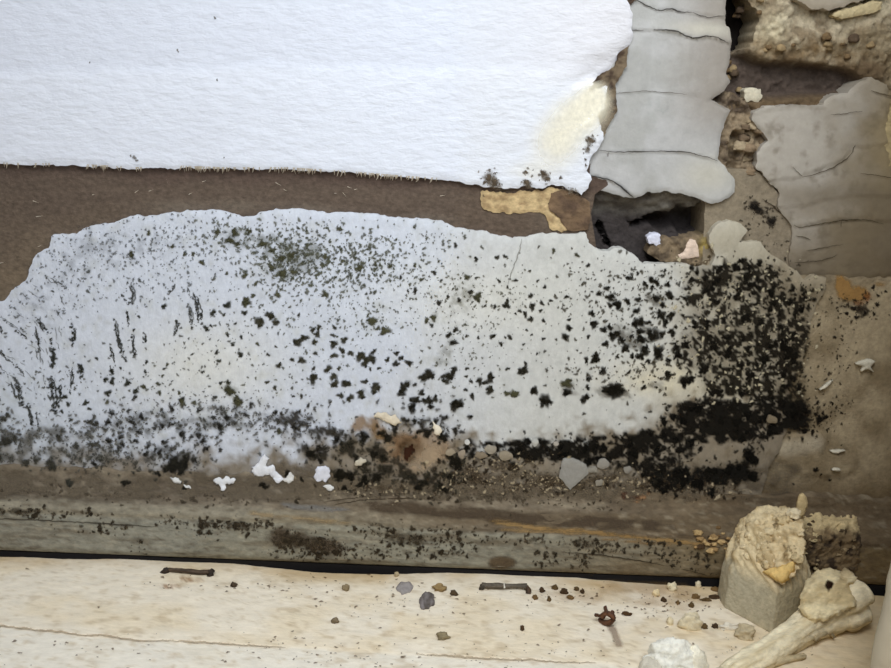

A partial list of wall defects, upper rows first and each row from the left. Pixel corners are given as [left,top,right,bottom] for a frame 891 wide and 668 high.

peeling [0,0,891,301]
leakage [0,195,887,576]